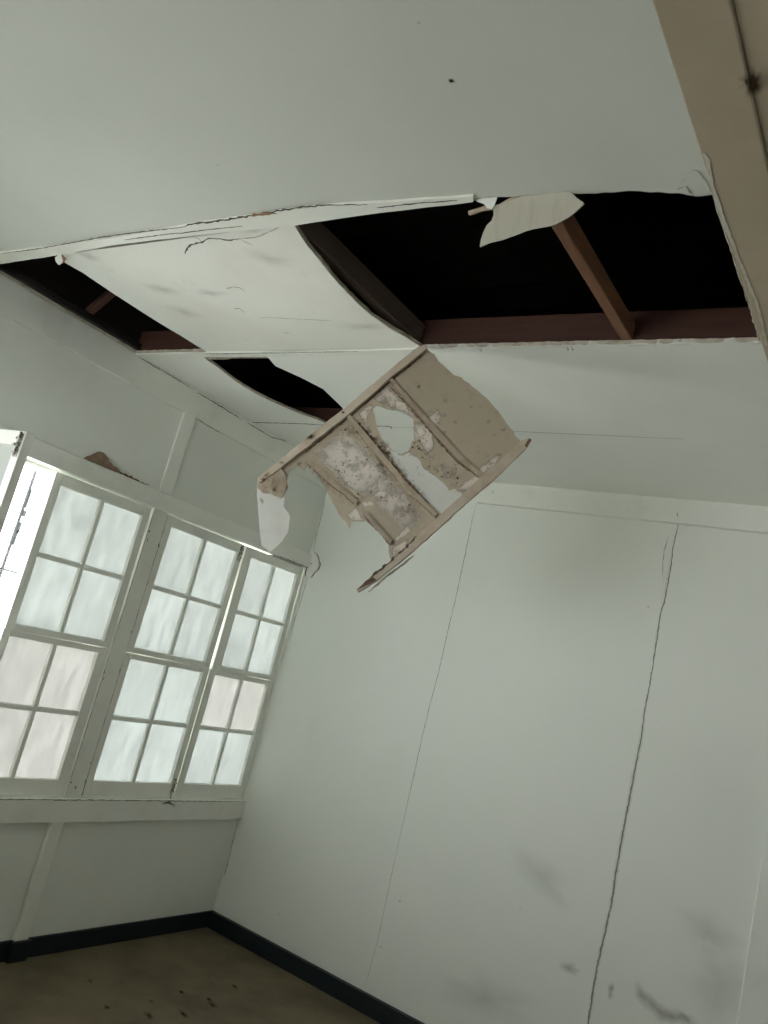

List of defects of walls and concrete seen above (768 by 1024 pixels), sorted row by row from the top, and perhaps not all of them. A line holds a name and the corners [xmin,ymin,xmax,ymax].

crack [2,200,457,254]
peeling [476,197,498,209]
peeling [703,154,768,346]
water stain [305,355,479,546]
crack [587,513,678,1024]